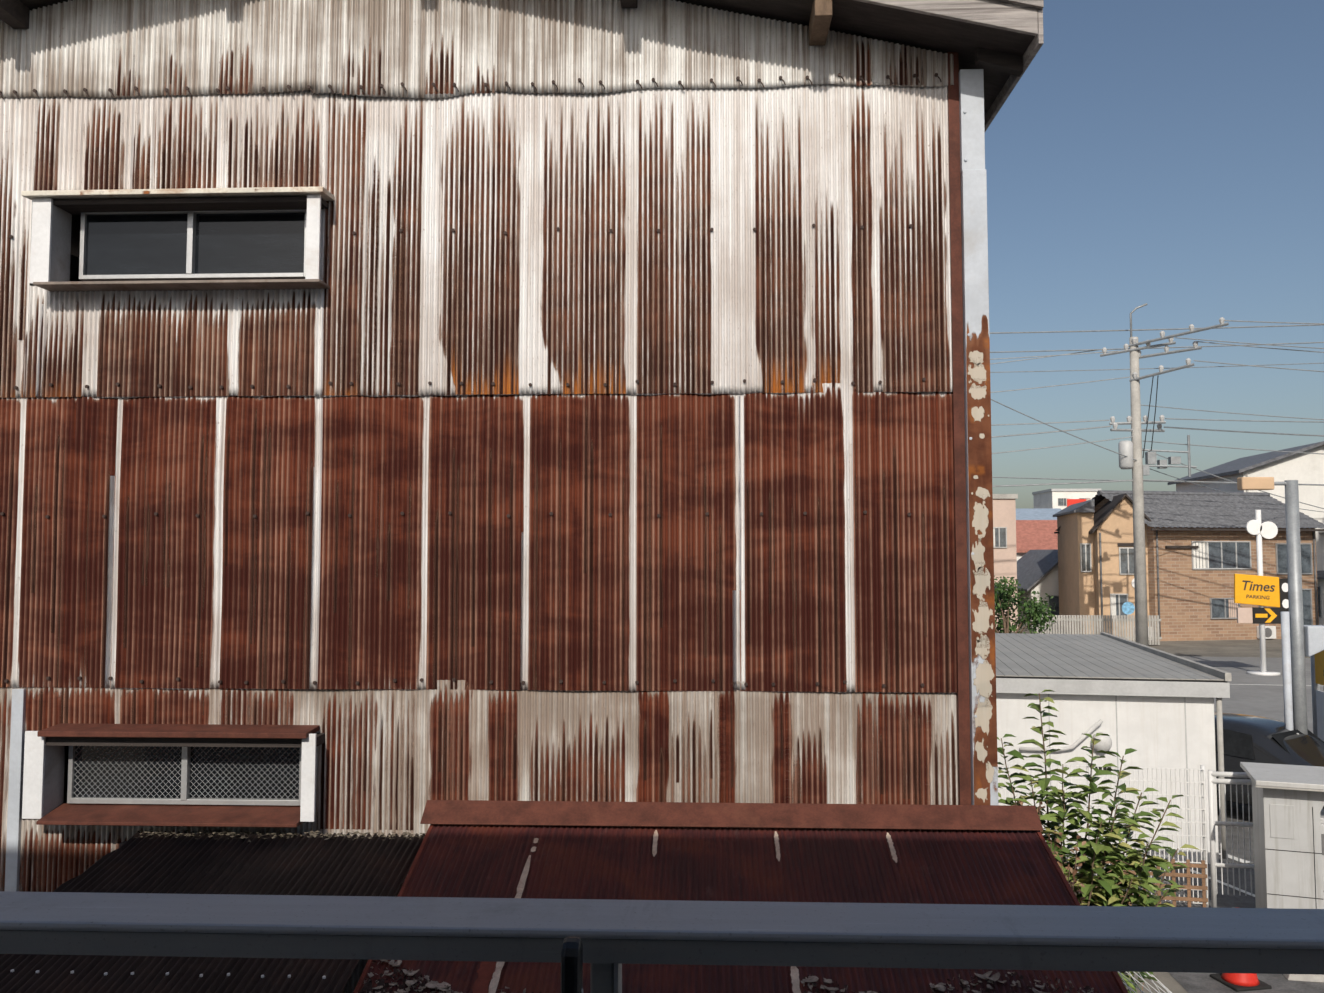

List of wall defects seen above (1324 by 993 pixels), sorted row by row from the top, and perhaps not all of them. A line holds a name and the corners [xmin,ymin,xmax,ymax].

corrosion [0,36,998,892]